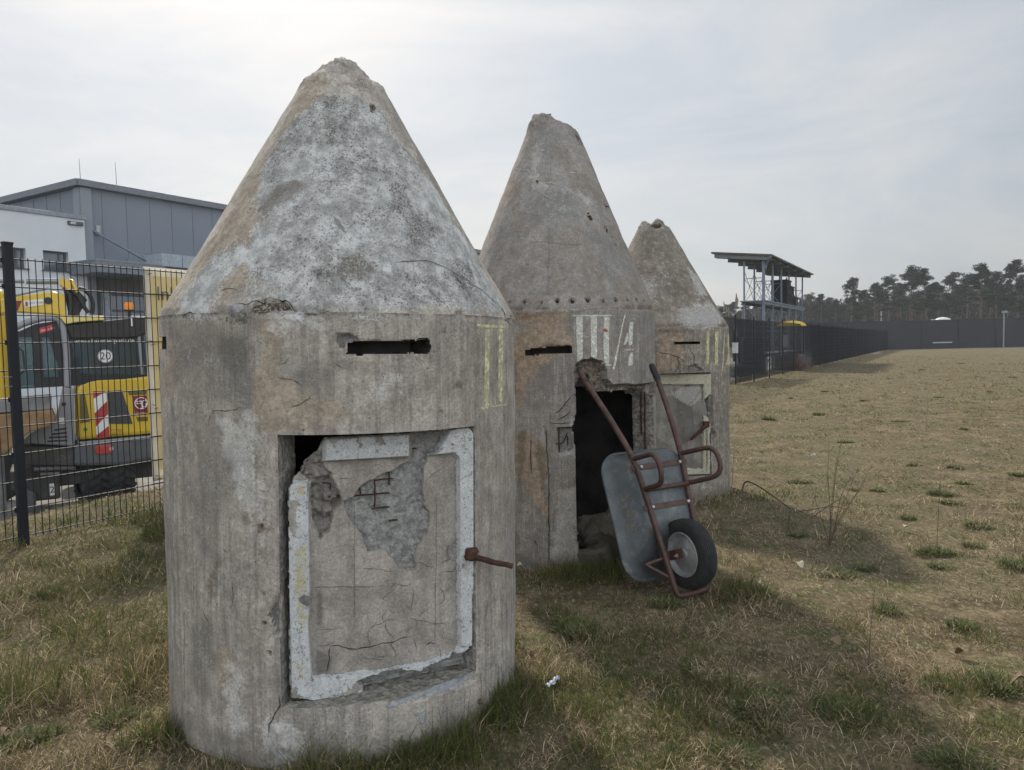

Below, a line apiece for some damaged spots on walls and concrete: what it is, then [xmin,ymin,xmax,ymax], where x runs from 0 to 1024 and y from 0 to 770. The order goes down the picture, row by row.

spalling [253,302,292,314]
spalling [575,359,652,391]
crack [311,504,456,676]
peeling [386,673,471,708]